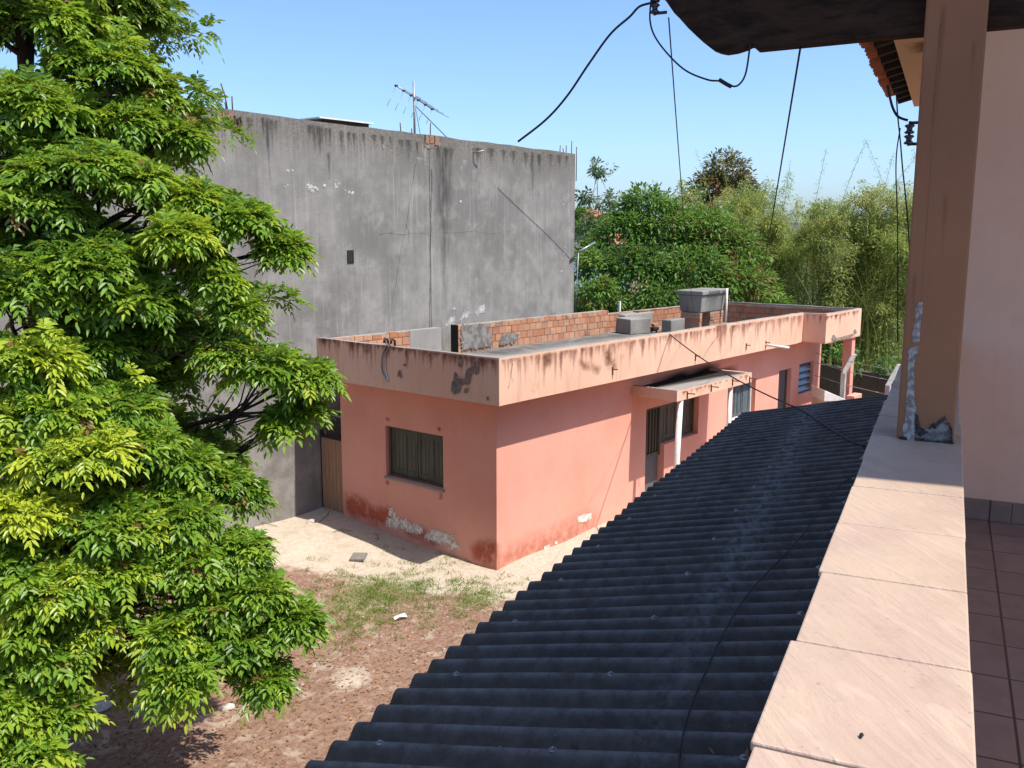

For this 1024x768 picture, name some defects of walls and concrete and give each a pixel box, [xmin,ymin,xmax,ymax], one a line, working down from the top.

peeling [446,305,520,394]
damp [643,366,747,393]
peeling [898,302,954,444]
damp [347,498,461,553]
damp [474,544,495,563]